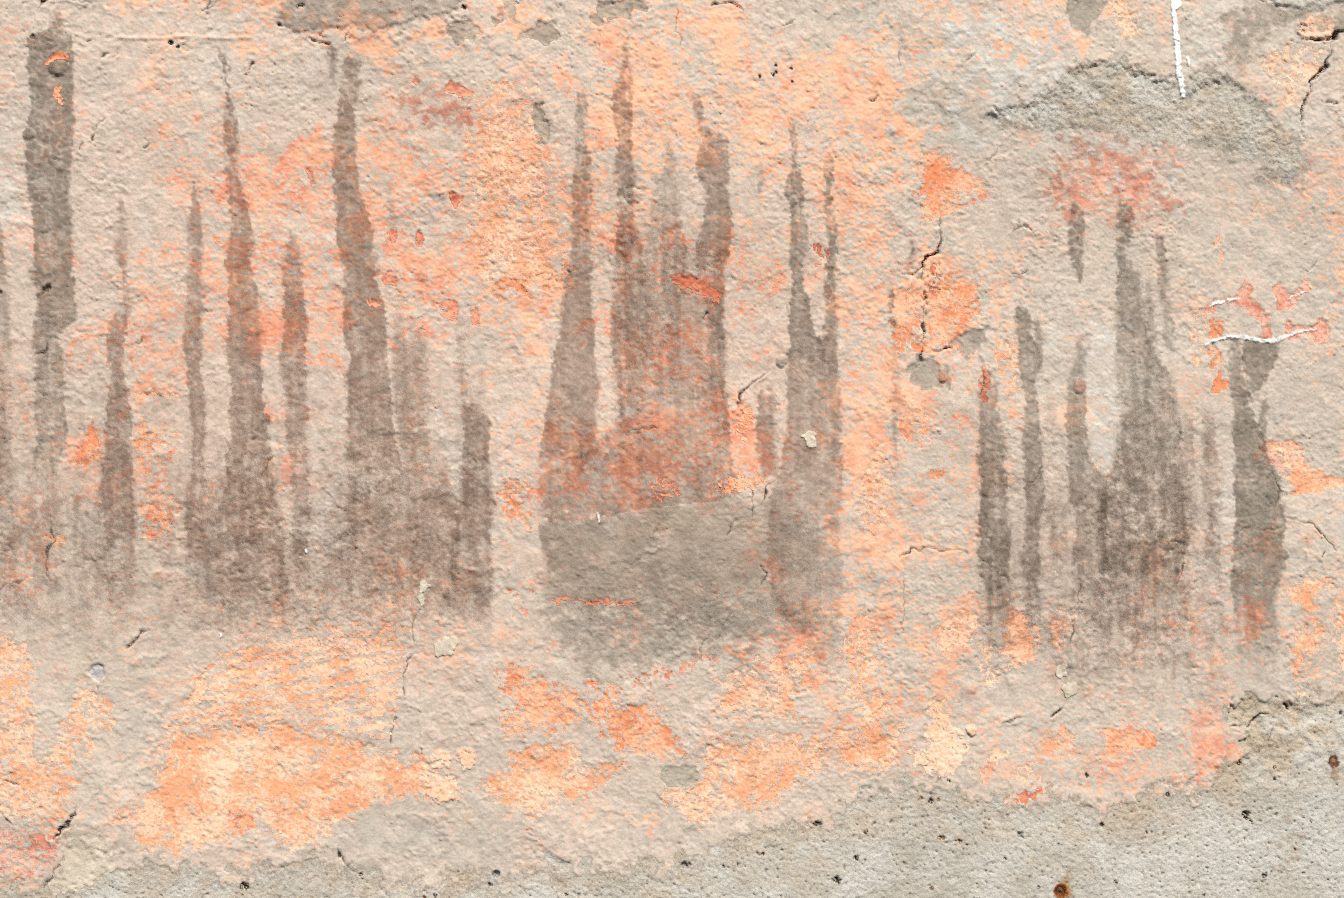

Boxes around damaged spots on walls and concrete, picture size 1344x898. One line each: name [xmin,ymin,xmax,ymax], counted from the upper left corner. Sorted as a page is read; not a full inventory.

peeling [446,0,561,46]
crack [1300,31,1344,120]
peeling [415,229,425,247]
peeling [439,78,578,326]
peeling [908,146,989,223]
peeling [669,273,722,303]
crack [919,241,947,359]
peeling [888,263,1024,448]
peeling [801,430,817,447]
peeling [715,472,767,494]
peeling [0,570,1344,898]
rust [1054,879,1071,898]